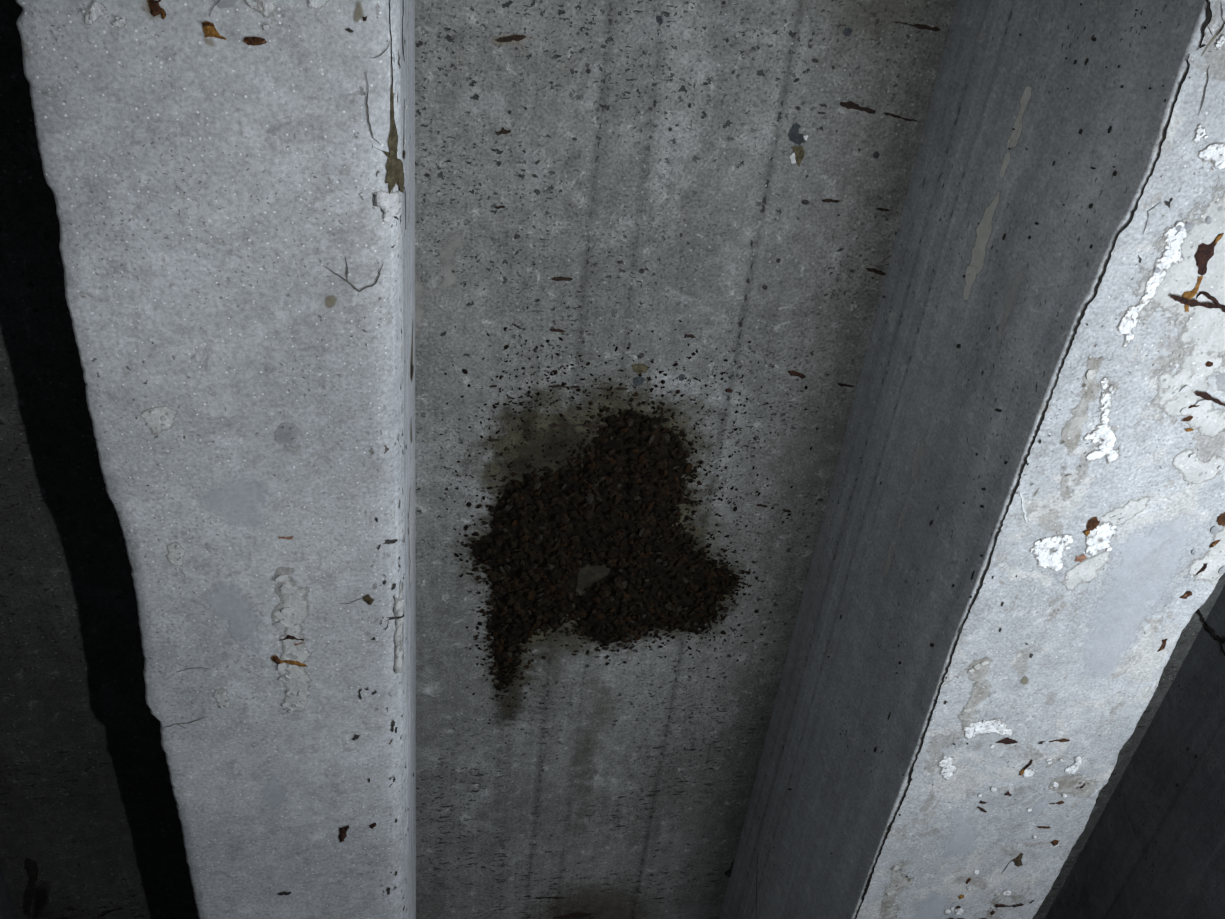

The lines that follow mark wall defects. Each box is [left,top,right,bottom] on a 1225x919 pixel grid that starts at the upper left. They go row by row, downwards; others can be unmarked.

corrosion [147,0,166,19]
corrosion [202,21,227,40]
corrosion [244,37,267,46]
spalling [371,84,406,222]
corrosion [1182,233,1224,312]
damp [469,381,738,629]
crack [855,0,1225,919]
damp [496,561,611,707]